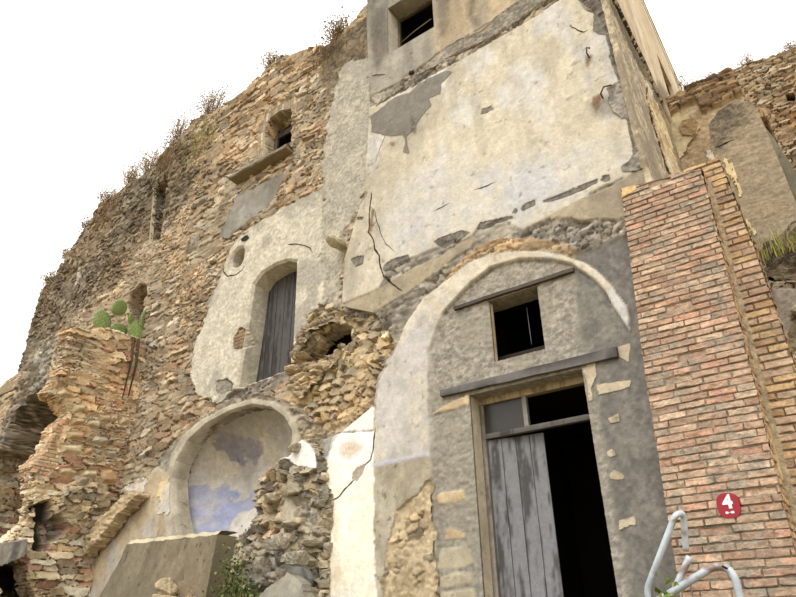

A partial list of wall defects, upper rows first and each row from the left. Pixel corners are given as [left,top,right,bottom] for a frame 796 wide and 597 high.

peeling [644,78,701,175]
crack [368,193,402,291]
spalling [383,255,410,271]
crack [333,427,376,500]
flaking render [379,480,439,597]